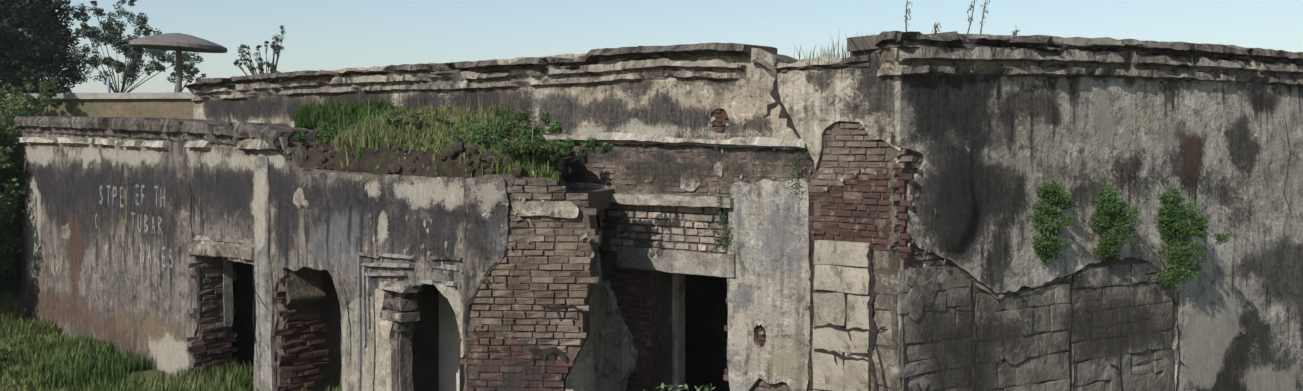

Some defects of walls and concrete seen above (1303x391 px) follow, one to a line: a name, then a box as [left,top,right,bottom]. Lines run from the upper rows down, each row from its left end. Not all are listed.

leakage [23,158,505,297]
spalling [365,109,1175,391]
crack [763,59,886,391]
crack [955,264,1088,391]
leakage [806,49,1303,391]